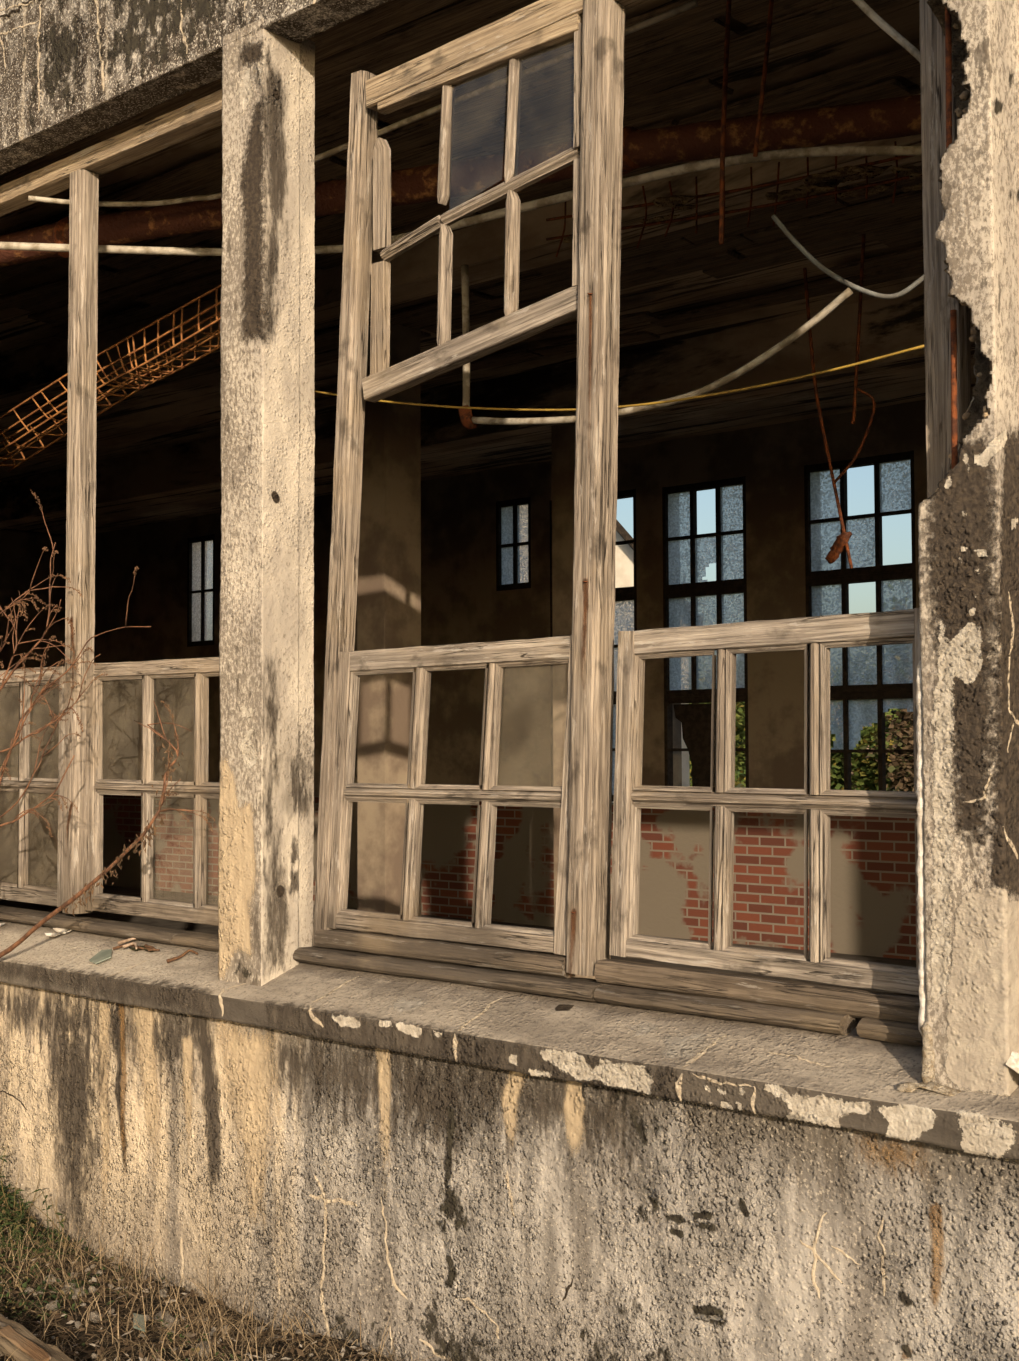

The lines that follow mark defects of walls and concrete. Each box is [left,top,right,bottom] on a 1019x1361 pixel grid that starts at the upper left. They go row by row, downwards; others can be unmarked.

crack [0,0,41,113]
crack [94,0,105,91]
crack [179,3,189,54]
spalling [926,0,971,189]
damp [239,40,287,341]
spalling [925,260,1008,500]
damp [263,663,312,968]
peeling [930,597,983,1007]
damp [0,962,706,1231]
peeling [509,1049,654,1095]
peeling [764,1084,936,1141]
damp [408,1303,498,1361]